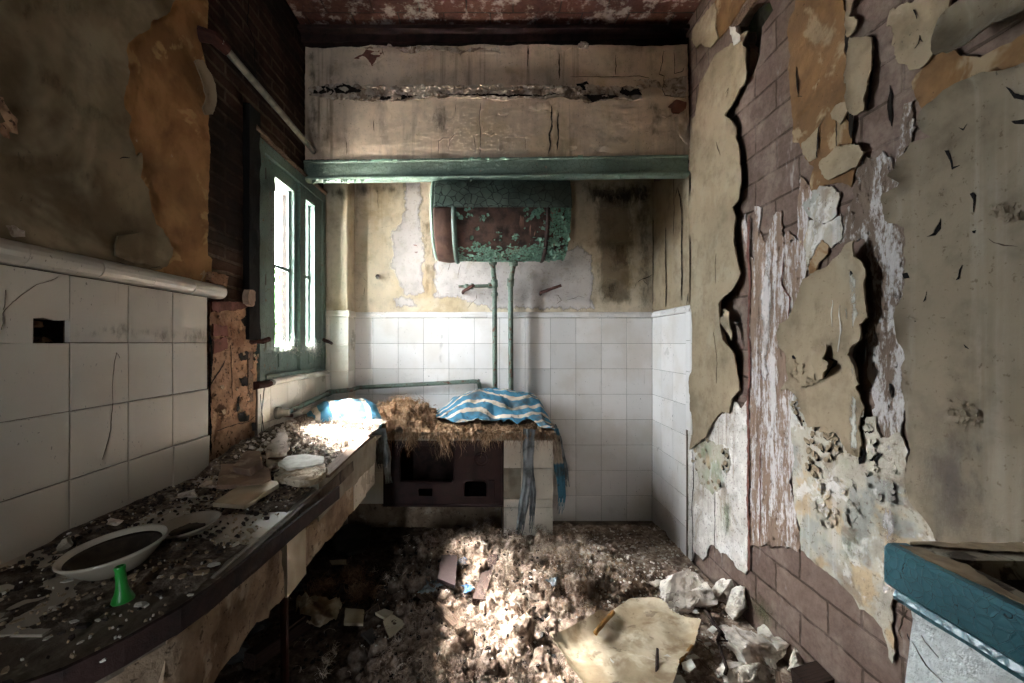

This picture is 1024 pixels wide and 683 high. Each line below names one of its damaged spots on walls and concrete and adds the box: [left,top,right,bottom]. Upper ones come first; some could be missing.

flaking render [886,0,1024,108]
peeling [0,0,259,463]
peeling [308,0,773,495]
peeling [776,0,902,534]
peeling [988,201,1023,224]
crack [102,352,120,460]
peeling [947,396,981,430]
peeling [900,541,1024,605]